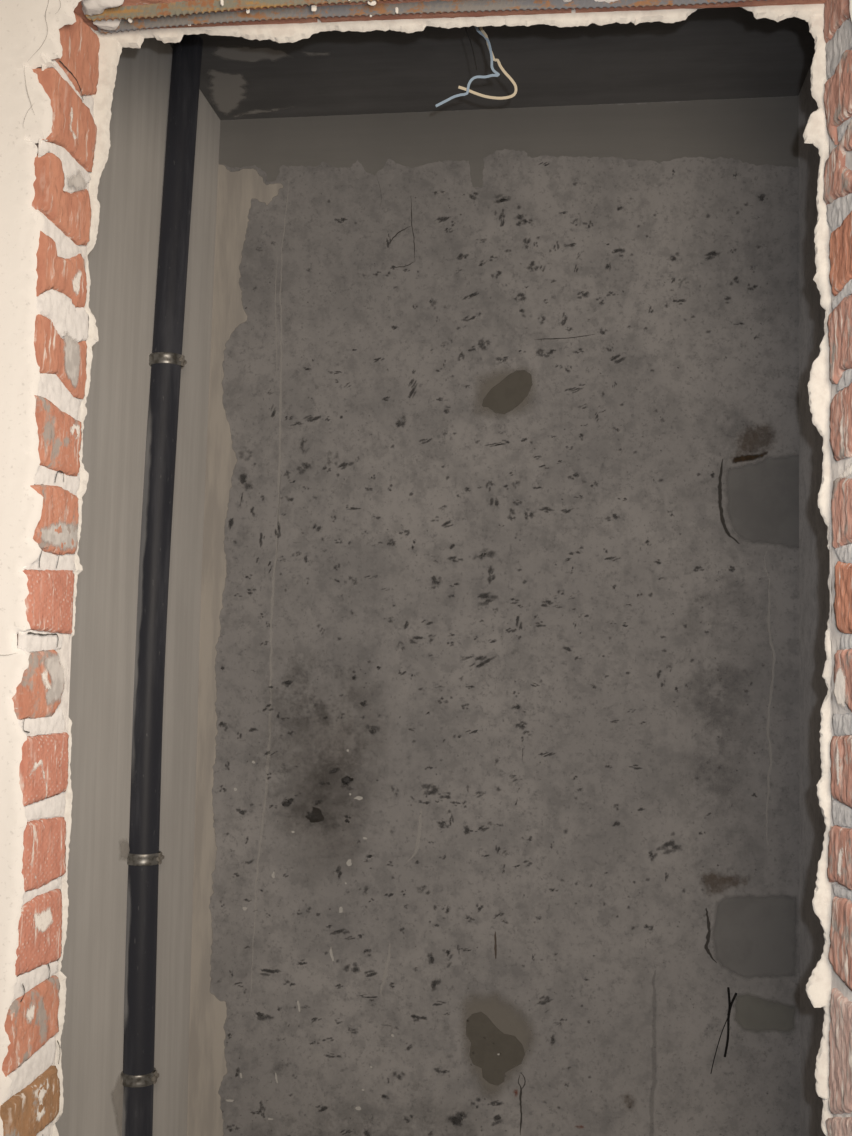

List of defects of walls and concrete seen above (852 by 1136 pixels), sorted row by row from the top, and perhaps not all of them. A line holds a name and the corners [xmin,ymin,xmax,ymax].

crack [718,459,740,544]
crack [705,908,717,963]